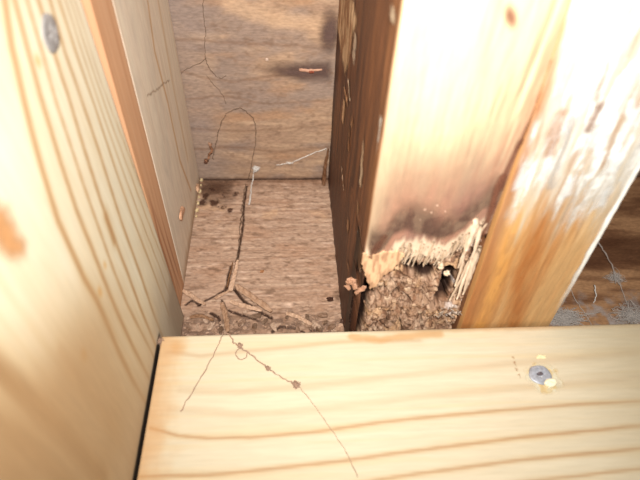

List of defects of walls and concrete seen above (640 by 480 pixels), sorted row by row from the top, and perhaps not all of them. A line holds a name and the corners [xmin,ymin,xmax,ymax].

water stain [276,65,328,78]
water stain [323,16,337,47]
peeling [338,0,357,72]
peeling [342,80,353,152]
water stain [369,140,524,255]
crack [185,186,317,333]